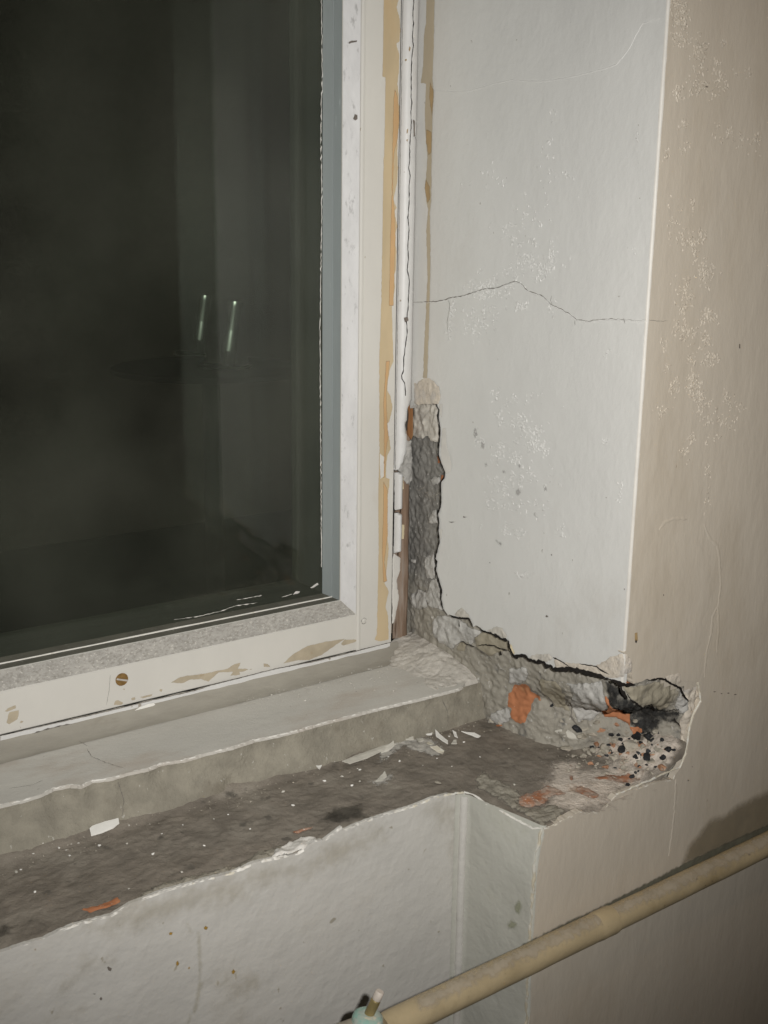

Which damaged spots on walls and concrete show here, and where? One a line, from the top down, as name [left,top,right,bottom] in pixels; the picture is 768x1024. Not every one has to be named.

crack [401,0,655,396]
spalling [0,0,701,829]
crack [435,404,689,726]
spalling [60,897,126,930]
peeling [137,818,373,901]